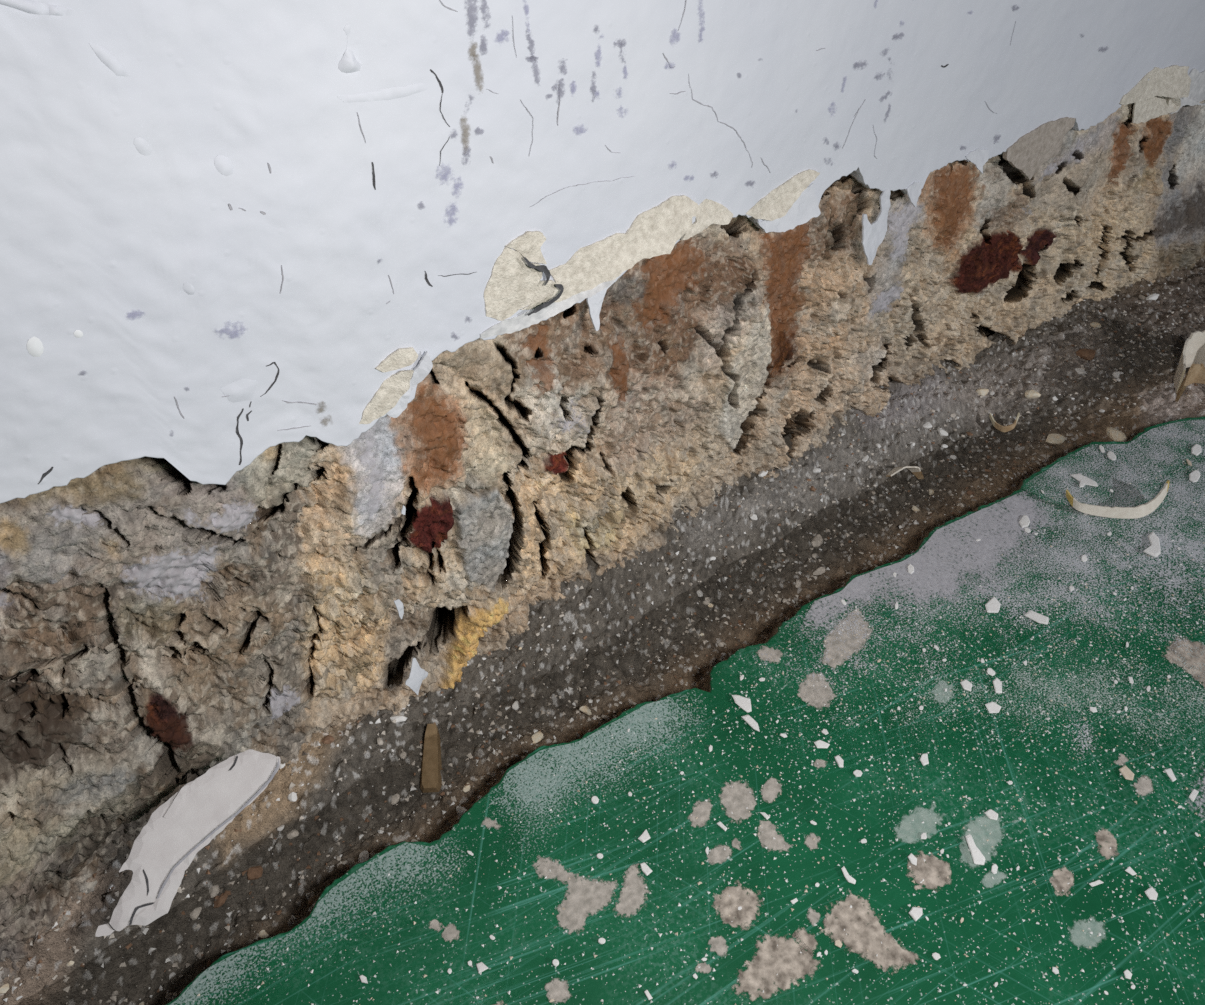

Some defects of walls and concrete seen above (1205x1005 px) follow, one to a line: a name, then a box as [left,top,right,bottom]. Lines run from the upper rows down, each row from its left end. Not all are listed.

crack [425,271,476,287]
crack [223,362,317,465]
flaking render [302,65,1205,734]
spalling [0,435,330,988]
peeling [814,755,844,768]
peeling [1114,754,1153,796]
peeling [688,778,821,865]
peeling [895,802,1021,892]
peeling [1095,828,1119,859]
peeling [429,919,460,942]
peeling [533,856,652,934]
flaking render [909,907,923,922]